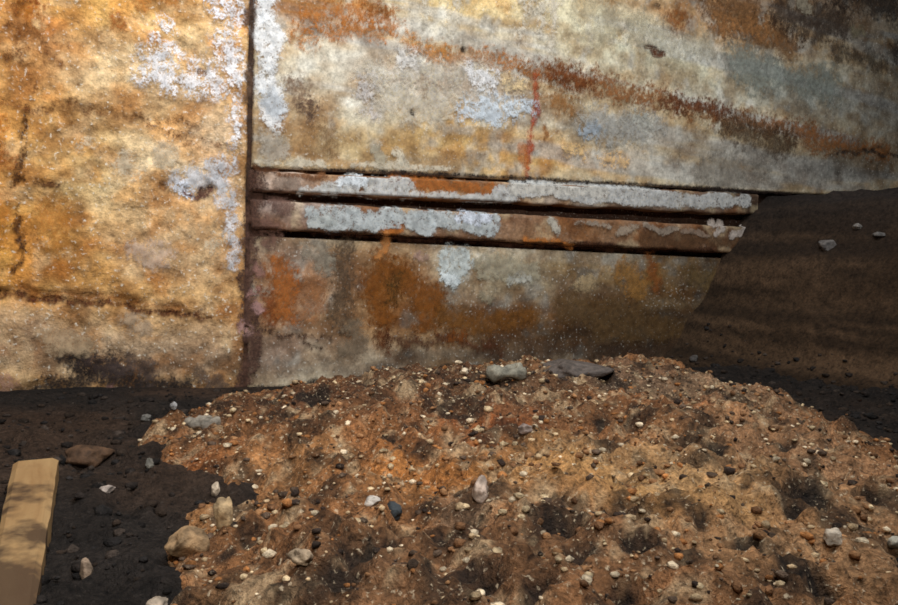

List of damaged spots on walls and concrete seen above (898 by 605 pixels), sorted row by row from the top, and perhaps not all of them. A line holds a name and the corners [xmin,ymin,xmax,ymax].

crack [0,0,232,321]
corrosion [109,12,126,30]
efflorescence [111,0,247,271]
peeling [243,0,751,277]
corrosion [288,0,893,177]
corrosion [257,255,325,326]
peeling [413,245,541,290]
corrosion [312,221,739,358]